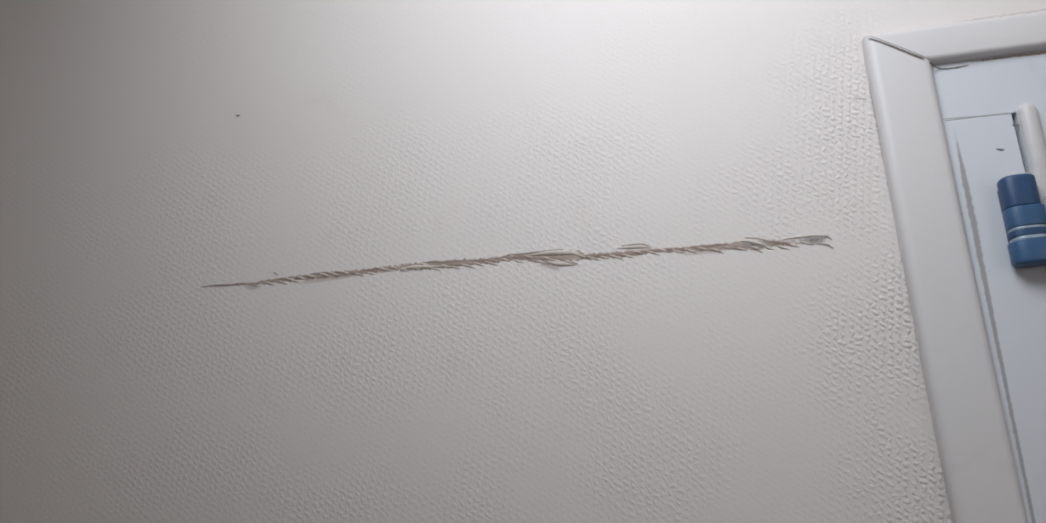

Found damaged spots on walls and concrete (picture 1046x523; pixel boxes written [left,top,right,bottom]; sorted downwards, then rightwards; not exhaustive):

crack [202,235,833,287]